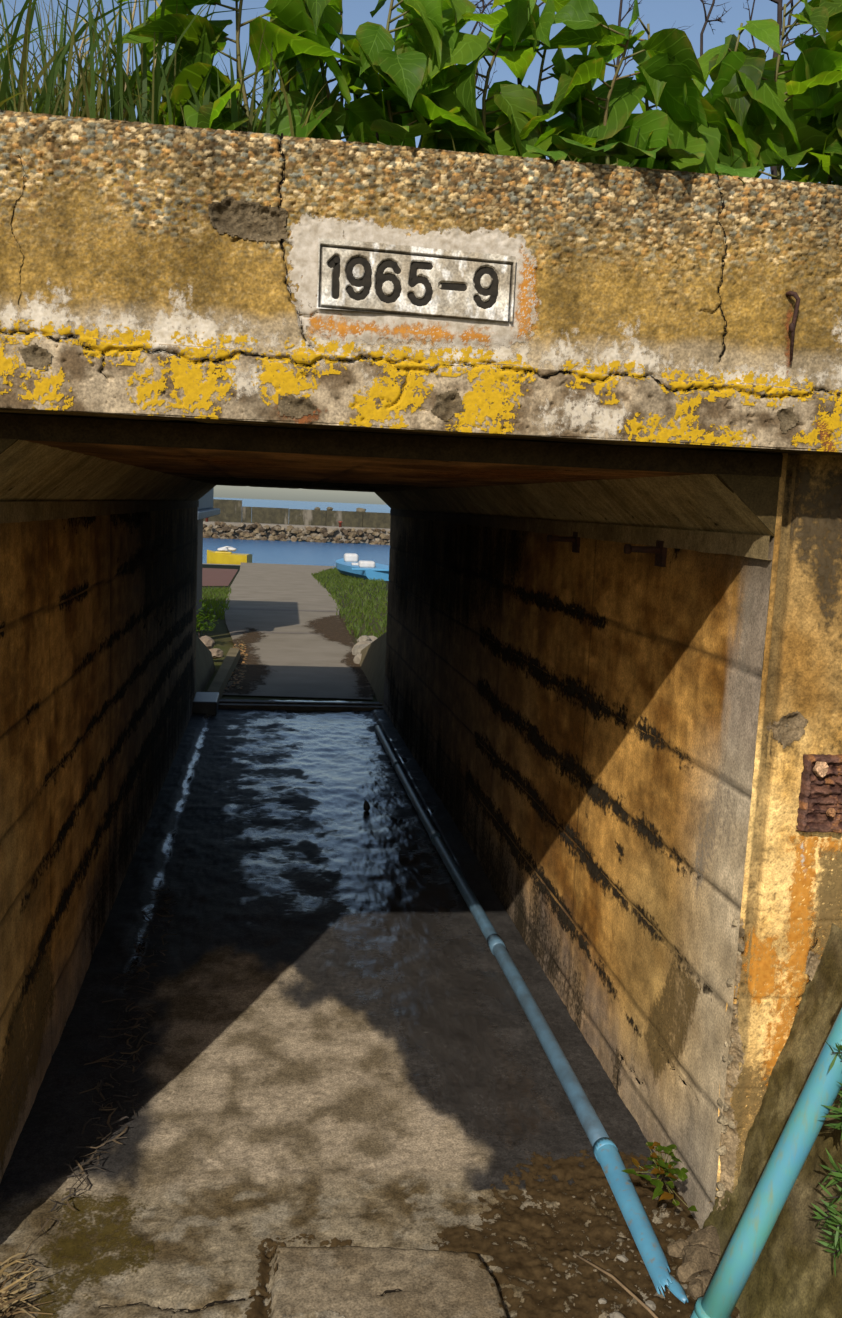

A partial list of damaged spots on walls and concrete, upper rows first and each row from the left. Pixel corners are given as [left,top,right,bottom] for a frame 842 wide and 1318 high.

crack [0,133,842,406]
rust [785,291,801,373]
rust [816,421,836,452]
water stain [785,459,842,625]
water stain [0,508,198,1169]
water stain [305,615,617,1028]
water stain [474,732,712,1077]
water stain [477,678,730,888]
rust [813,761,829,777]
spalling [716,919,745,1211]
crack [377,1288,402,1296]